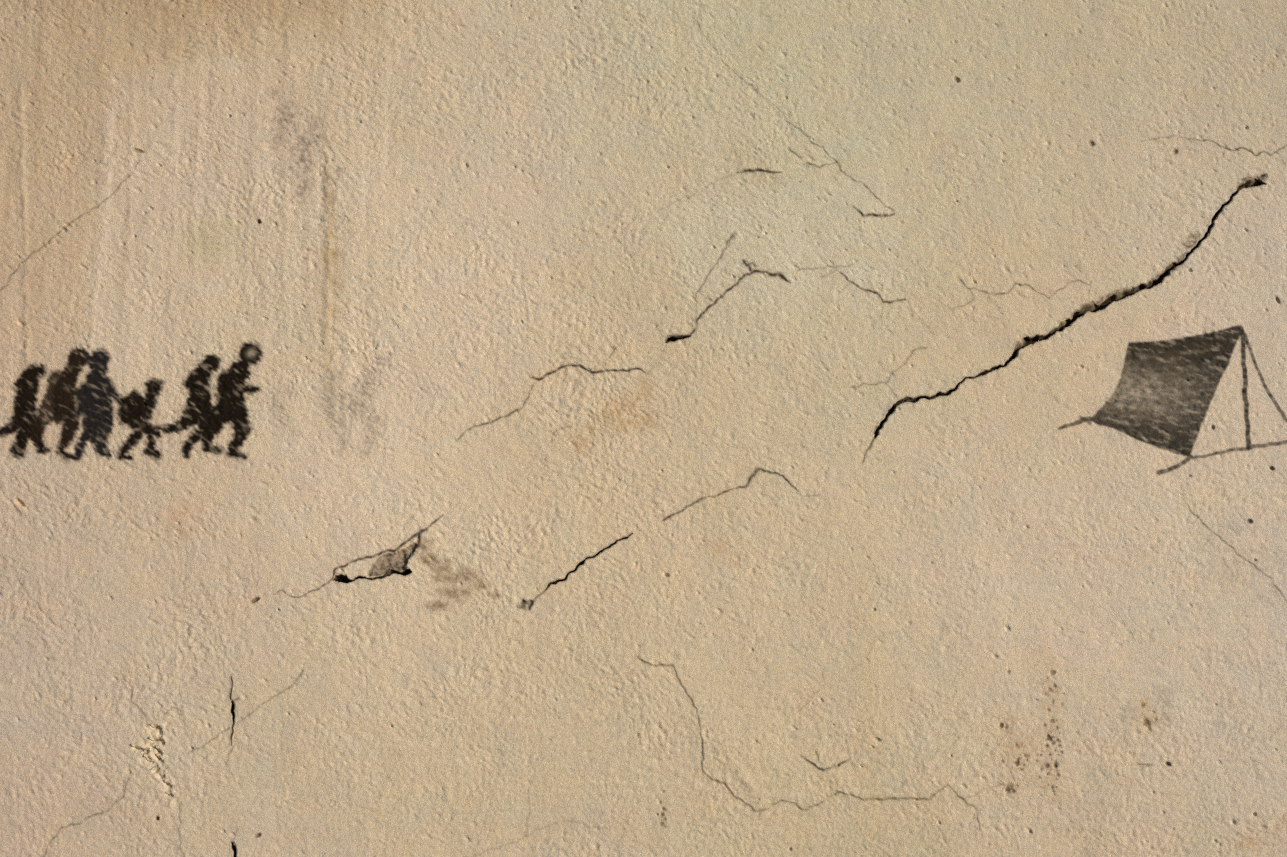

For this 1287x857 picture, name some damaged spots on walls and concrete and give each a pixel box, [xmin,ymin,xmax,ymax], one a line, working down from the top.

crack [455,133,1287,464]
flaking render [248,513,445,604]
crack [531,466,820,604]
crack [119,670,180,725]
crack [187,668,305,769]
crack [41,771,132,857]
crack [176,801,187,857]
crack [229,821,239,857]